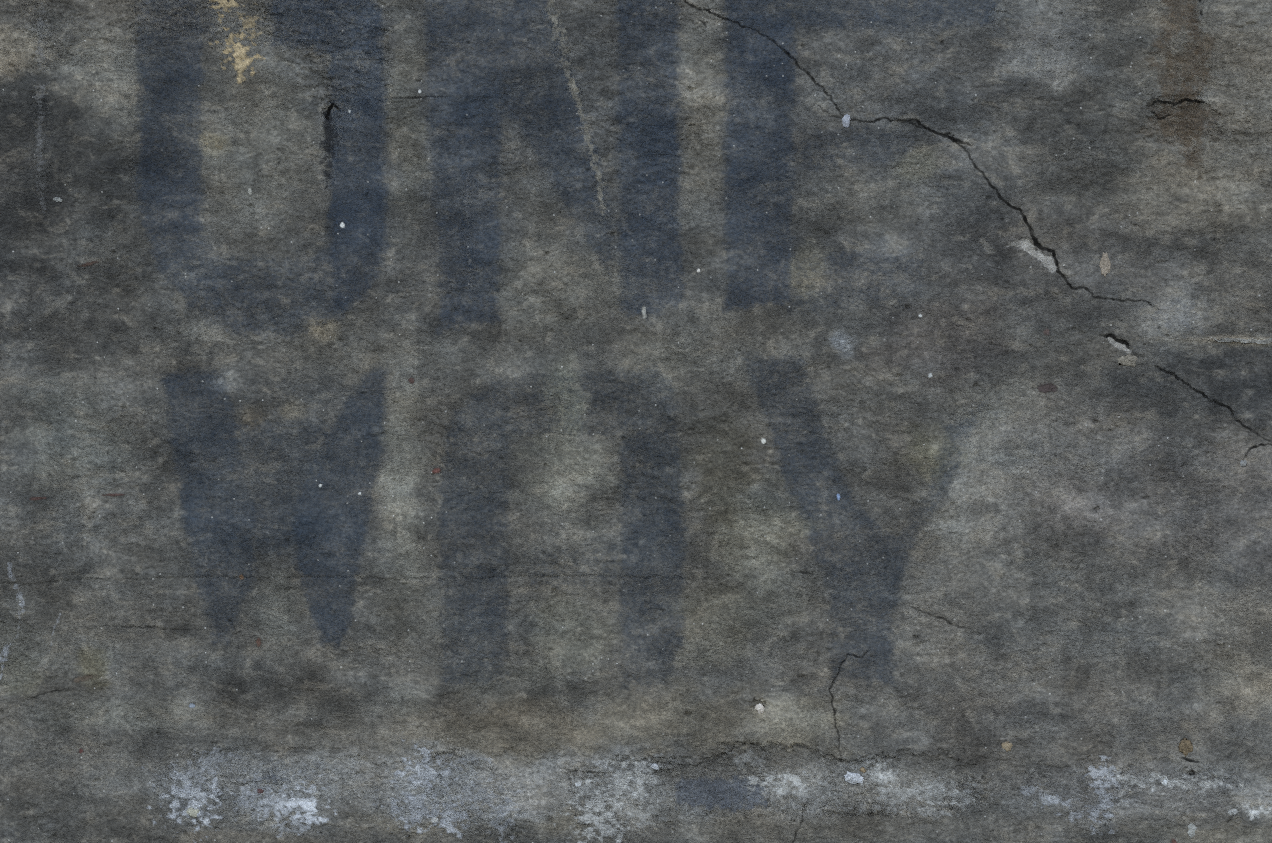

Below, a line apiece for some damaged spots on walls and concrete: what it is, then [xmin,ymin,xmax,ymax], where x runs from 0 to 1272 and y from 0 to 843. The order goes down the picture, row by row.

crack [684,0,744,28]
crack [1151,98,1202,119]
crack [870,118,1122,301]
crack [1104,334,1265,449]
water stain [147,764,337,843]
water stain [381,740,472,838]
water stain [564,753,662,843]
water stain [736,754,830,802]
water stain [861,762,979,815]
water stain [1022,756,1244,834]
water stain [1228,801,1272,819]